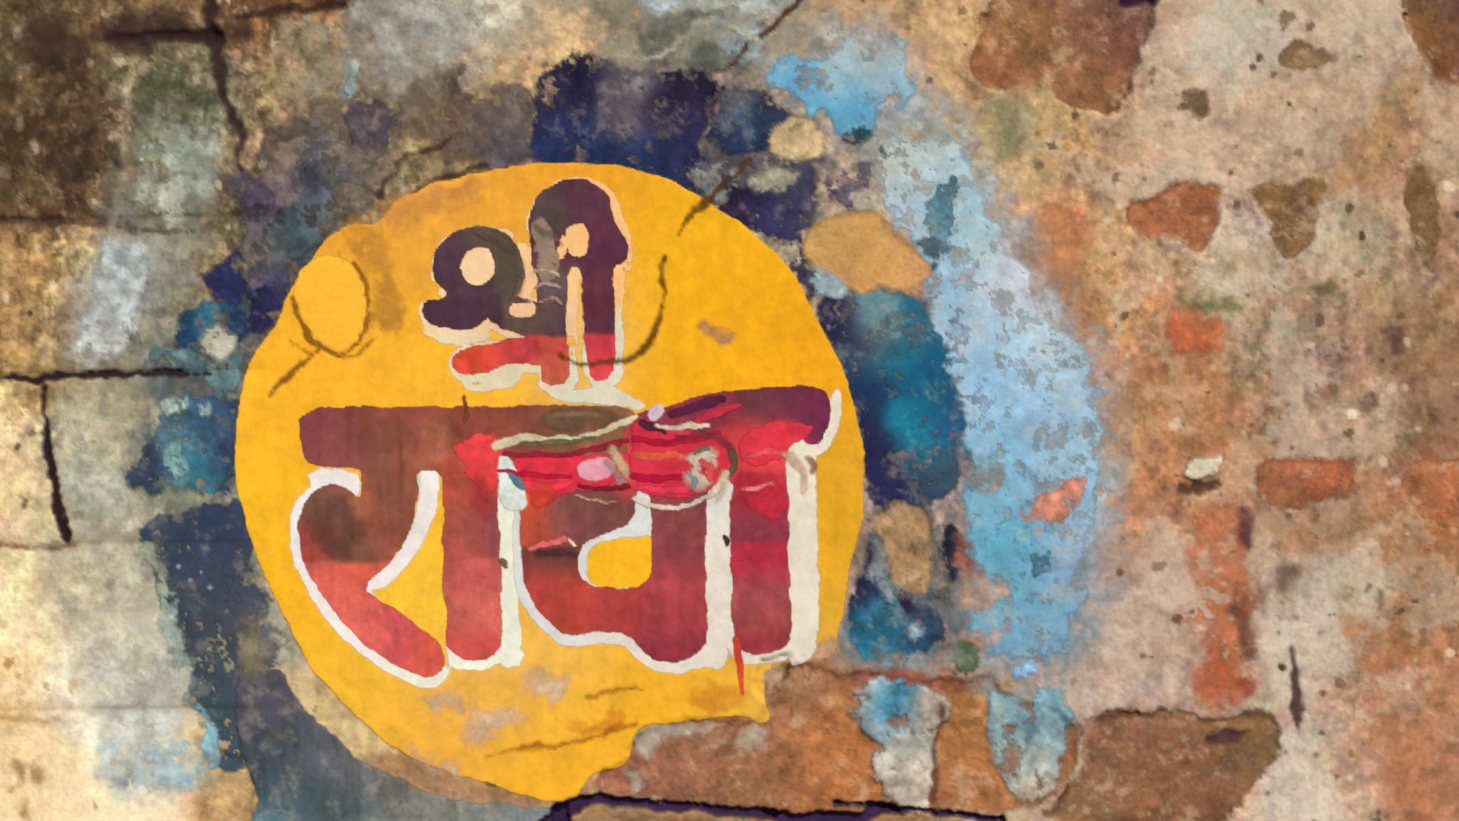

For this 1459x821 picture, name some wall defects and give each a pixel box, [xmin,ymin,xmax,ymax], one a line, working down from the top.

leakage [103,11,187,52]
crack [112,0,347,170]
crack [732,0,802,65]
spalling [1279,40,1330,70]
spalling [1402,0,1459,85]
spalling [1251,178,1326,258]
peeling [73,240,148,368]
peeling [57,389,150,514]
crack [0,368,211,550]
peeling [121,0,1281,821]